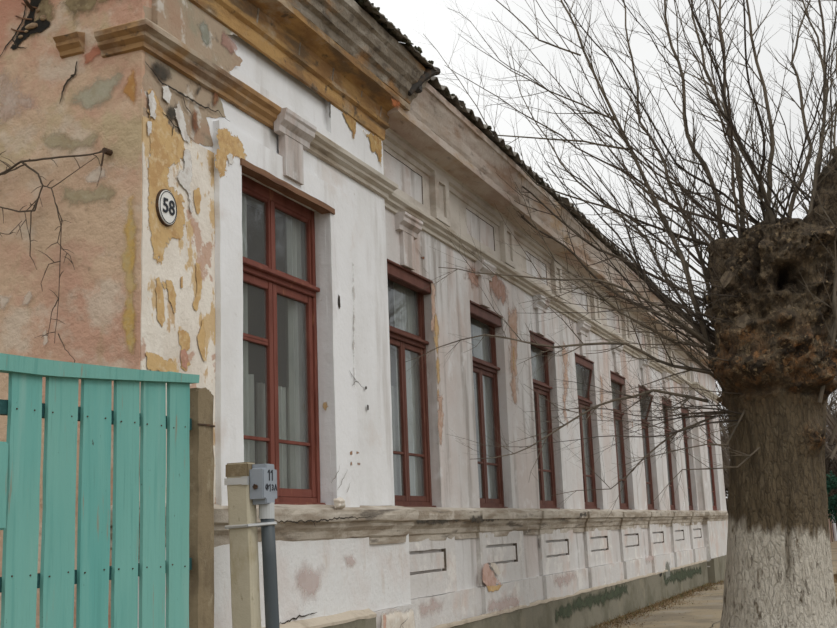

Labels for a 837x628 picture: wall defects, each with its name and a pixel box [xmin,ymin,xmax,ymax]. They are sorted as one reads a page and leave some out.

crack [59,61,77,104]
crack [146,63,229,142]
spalling [147,85,201,264]
spalling [214,128,246,178]
spalling [155,276,183,326]
spalling [193,262,202,311]
spalling [146,319,206,372]